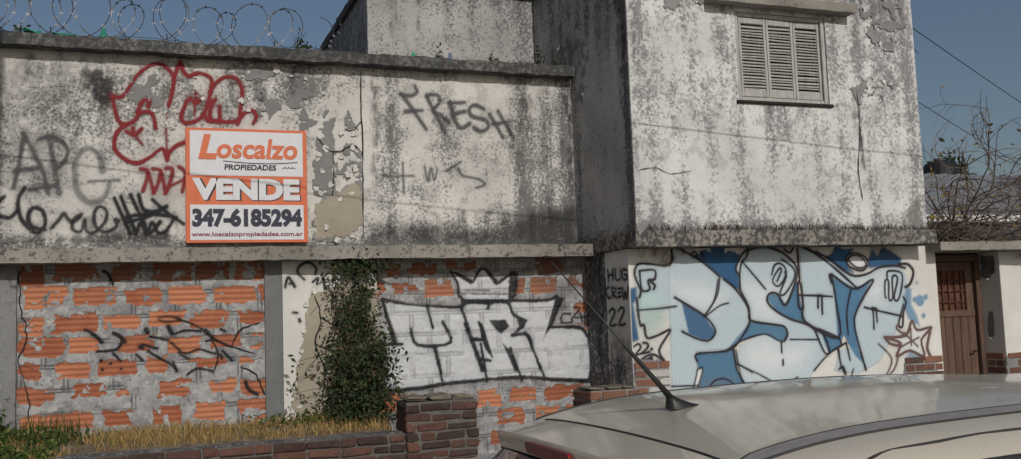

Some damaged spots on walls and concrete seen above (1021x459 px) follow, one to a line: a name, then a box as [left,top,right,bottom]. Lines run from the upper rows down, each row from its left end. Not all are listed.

peeling [655,0,680,10]
damp [86,69,112,105]
peeling [229,62,364,243]
spalling [634,359,671,394]